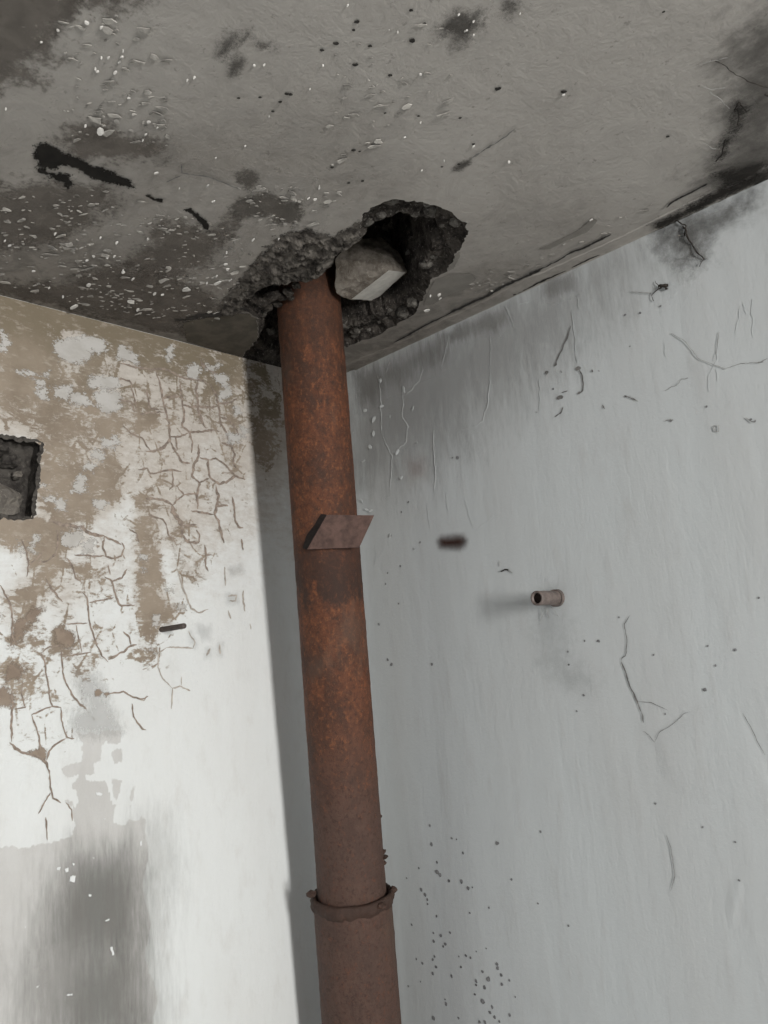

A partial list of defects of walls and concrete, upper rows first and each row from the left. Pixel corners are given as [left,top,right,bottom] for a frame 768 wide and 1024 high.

crack [0,585,15,643]
crack [10,359,251,840]
peeling [0,14,516,1024]
crack [621,617,688,742]